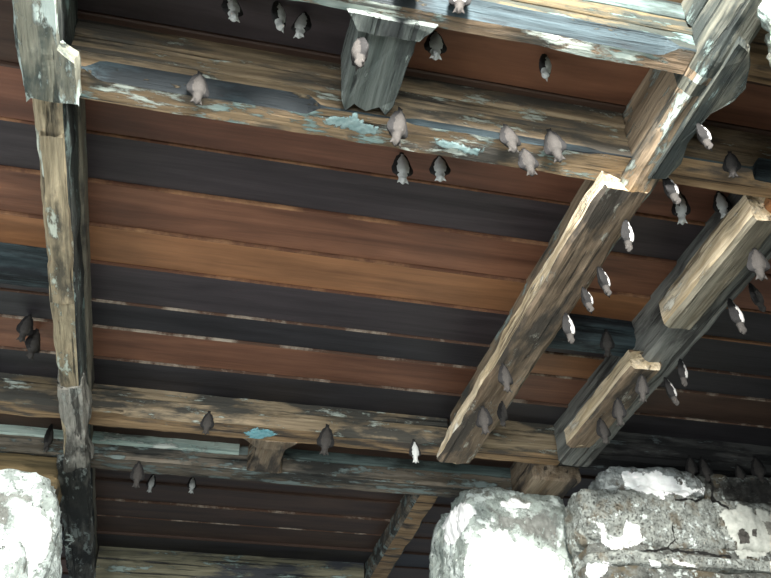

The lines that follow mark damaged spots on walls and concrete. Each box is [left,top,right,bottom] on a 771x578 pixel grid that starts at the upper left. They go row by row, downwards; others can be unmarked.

peeling [322,113,379,135]
peeling [434,138,484,156]